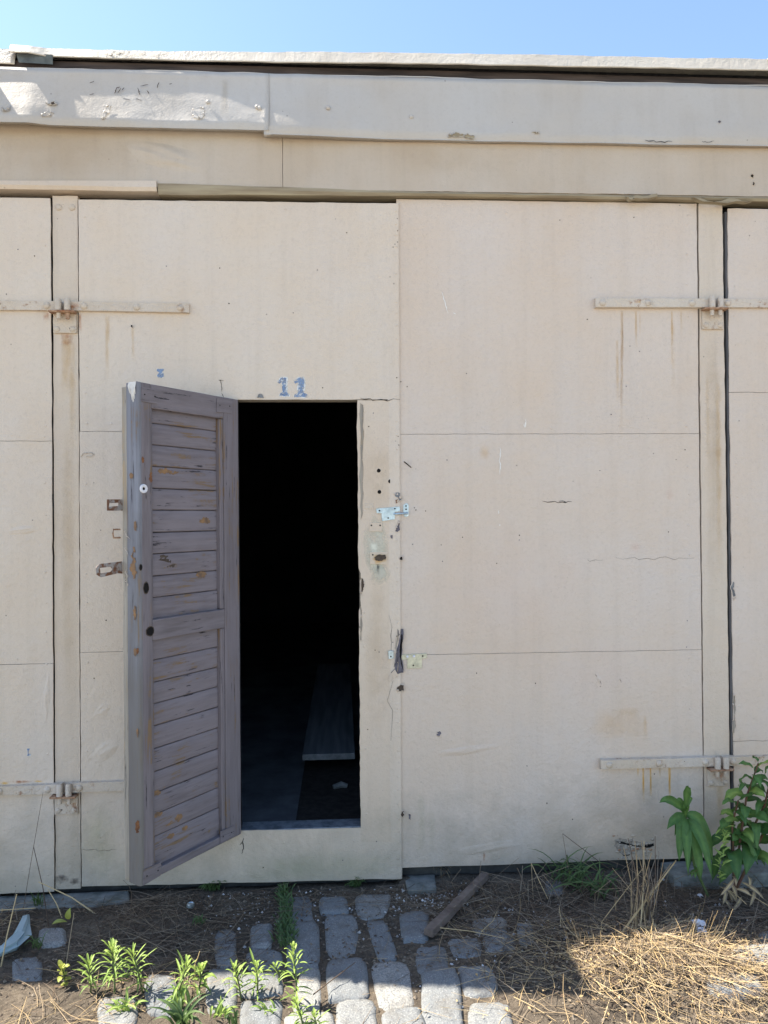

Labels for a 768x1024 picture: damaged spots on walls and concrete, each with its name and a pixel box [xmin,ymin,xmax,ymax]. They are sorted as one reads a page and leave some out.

spalling [612,834,655,863]